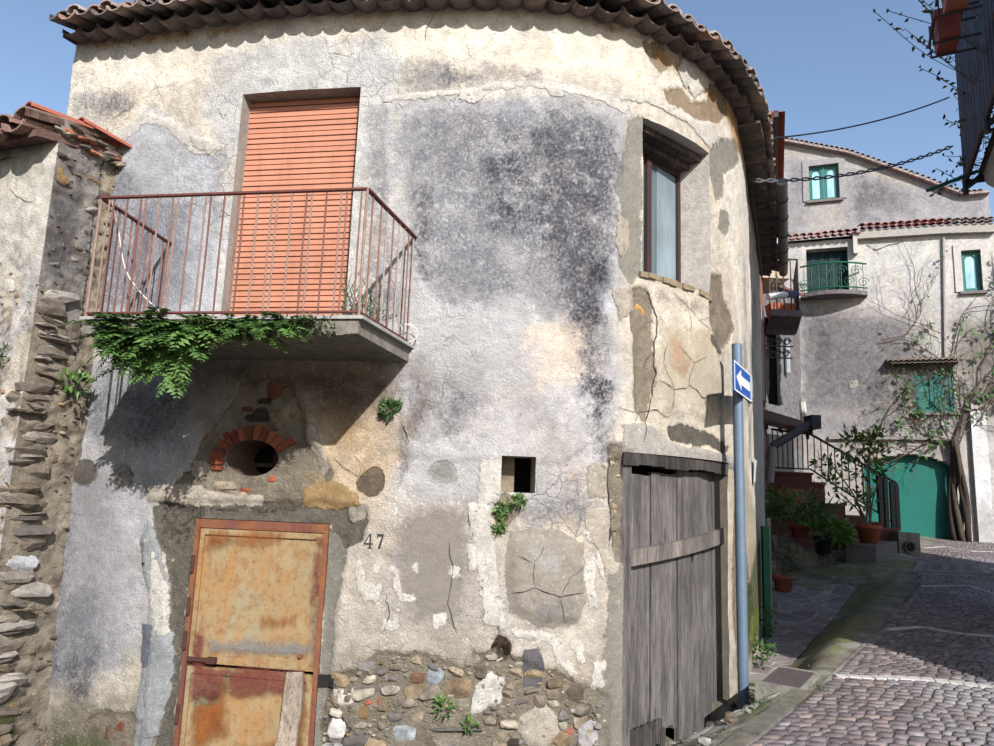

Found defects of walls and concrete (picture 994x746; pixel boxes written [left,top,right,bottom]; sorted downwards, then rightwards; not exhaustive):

flaking render [115,112,222,157]
leakage [412,106,621,402]
spalling [381,40,739,421]
crack [622,289,715,440]
spalling [668,423,729,453]
spalling [81,378,607,746]
leakage [749,601,759,650]
corrosion [193,696,223,746]